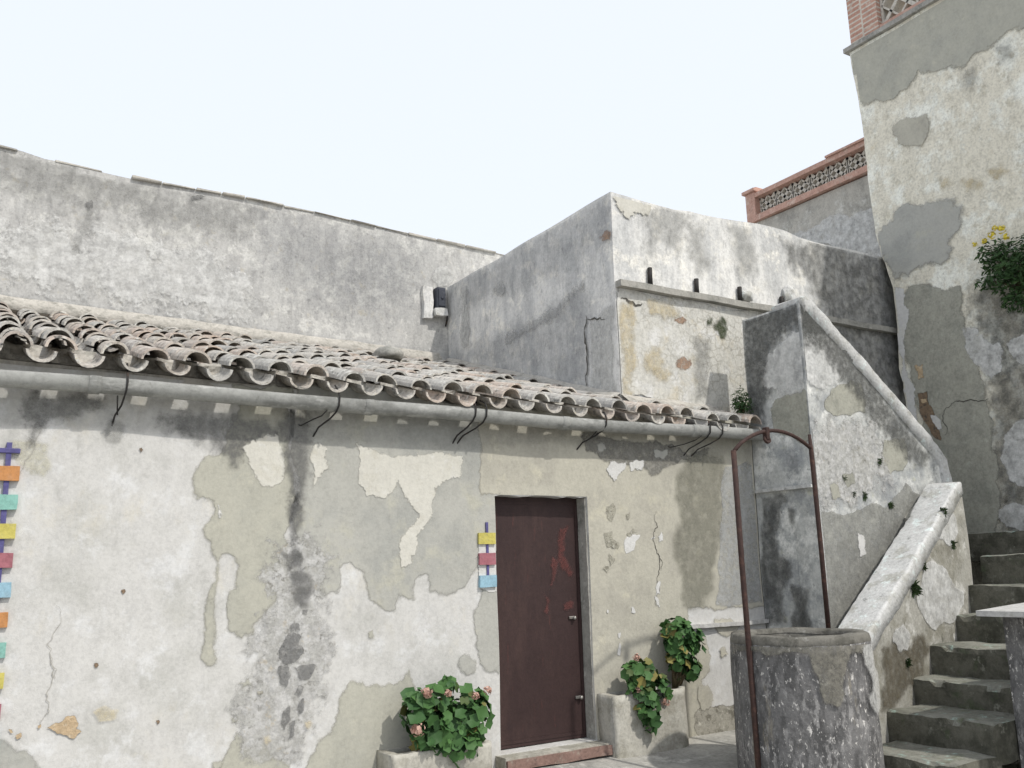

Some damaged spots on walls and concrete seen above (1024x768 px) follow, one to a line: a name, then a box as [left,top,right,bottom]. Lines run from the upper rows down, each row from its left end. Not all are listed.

peeling [851,0,1024,106]
damp [24,391,101,427]
crack [584,317,605,386]
peeling [590,288,763,425]
peeling [793,198,1024,546]
crack [942,399,987,435]
damp [162,413,311,606]
peeling [192,384,867,768]
crack [651,515,663,607]
damp [676,454,723,606]
peeling [917,561,964,630]
crack [40,605,62,724]